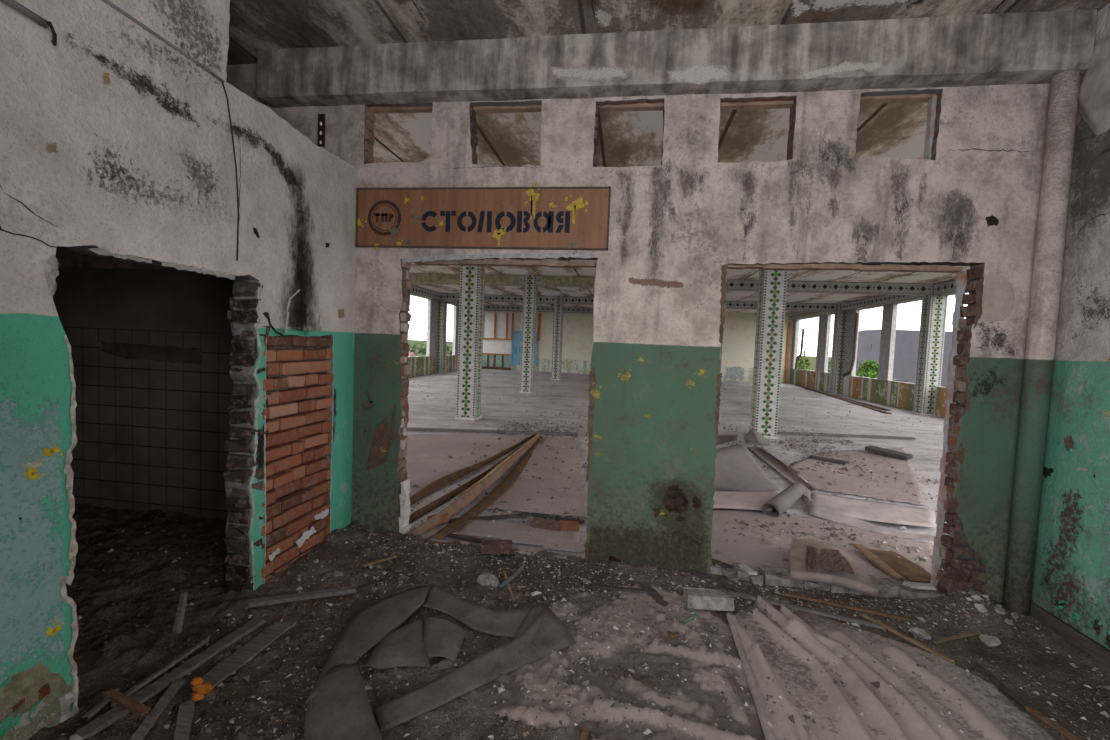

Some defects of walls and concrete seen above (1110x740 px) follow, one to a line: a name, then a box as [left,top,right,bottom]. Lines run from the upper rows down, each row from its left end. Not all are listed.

leakage [108,0,228,88]
crack [0,185,60,248]
leakage [47,138,225,214]
leakage [1070,112,1110,235]
spalling [973,276,984,330]
peeling [0,335,79,740]
peeling [1040,467,1110,649]